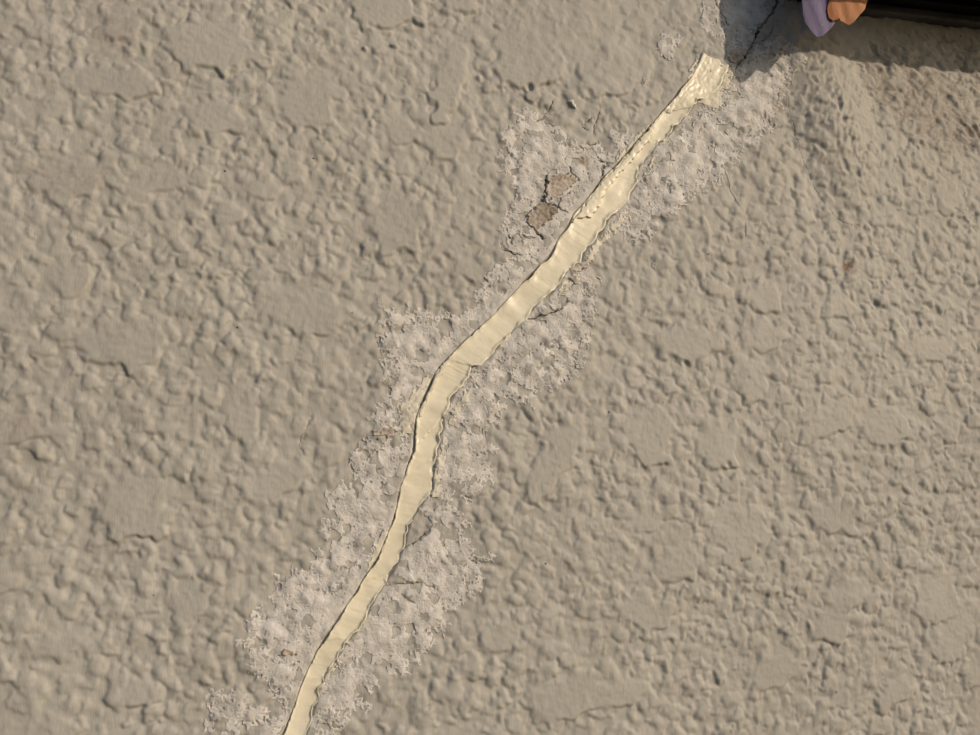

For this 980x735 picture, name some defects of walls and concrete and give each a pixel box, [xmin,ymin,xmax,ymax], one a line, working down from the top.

peeling [204,107,638,735]
crack [283,0,780,735]